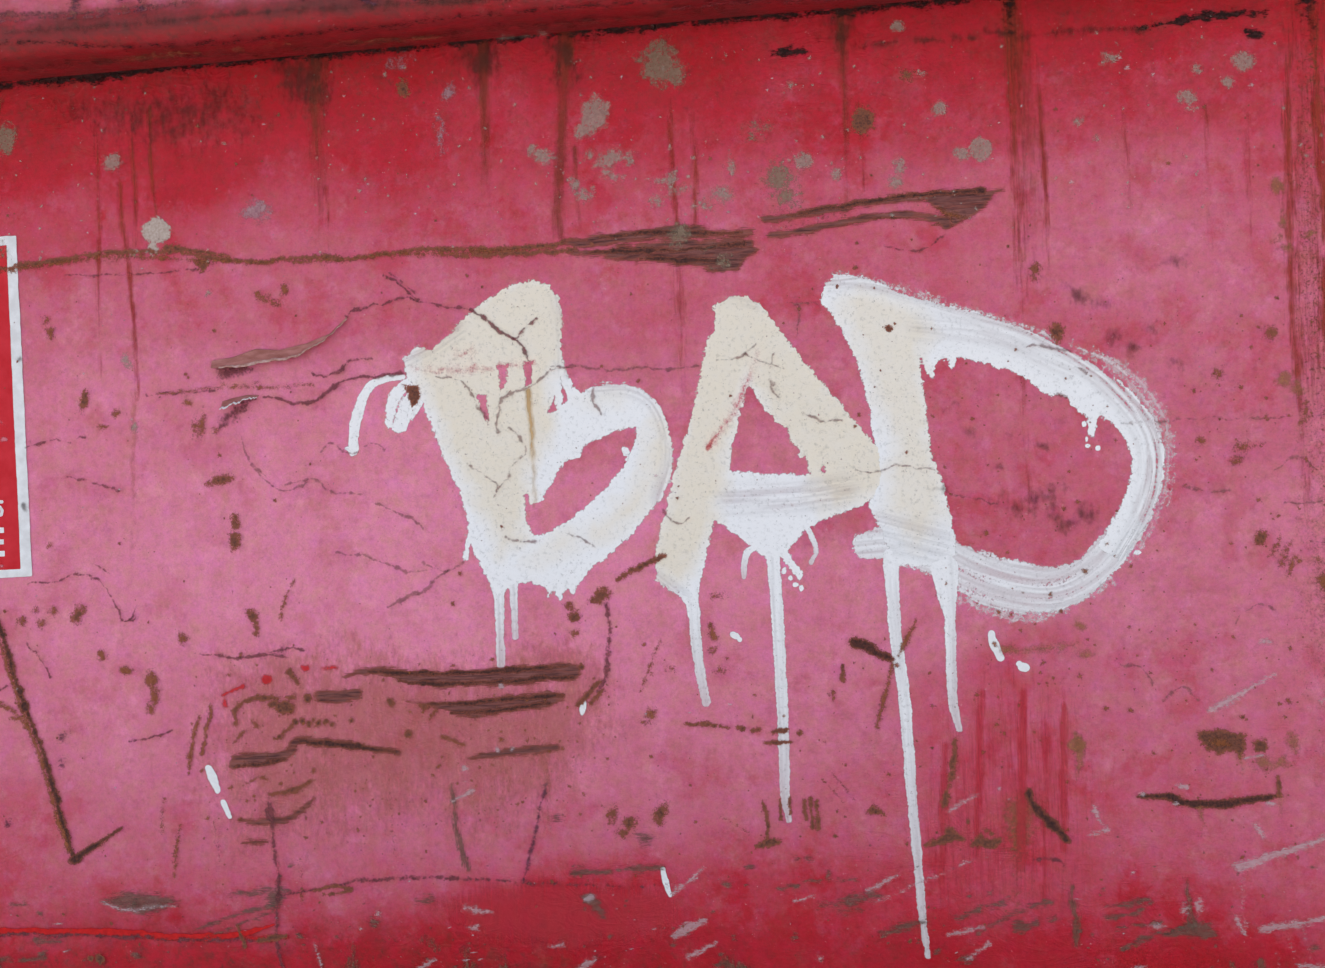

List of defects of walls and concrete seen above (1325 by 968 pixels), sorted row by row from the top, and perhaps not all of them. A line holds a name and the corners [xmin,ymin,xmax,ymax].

peeling [633,38,686,90]
peeling [528,145,555,162]
peeling [570,95,633,199]
peeling [763,153,812,210]
rust [1229,0,1325,430]
peeling [211,317,347,379]
peeling [219,395,259,429]